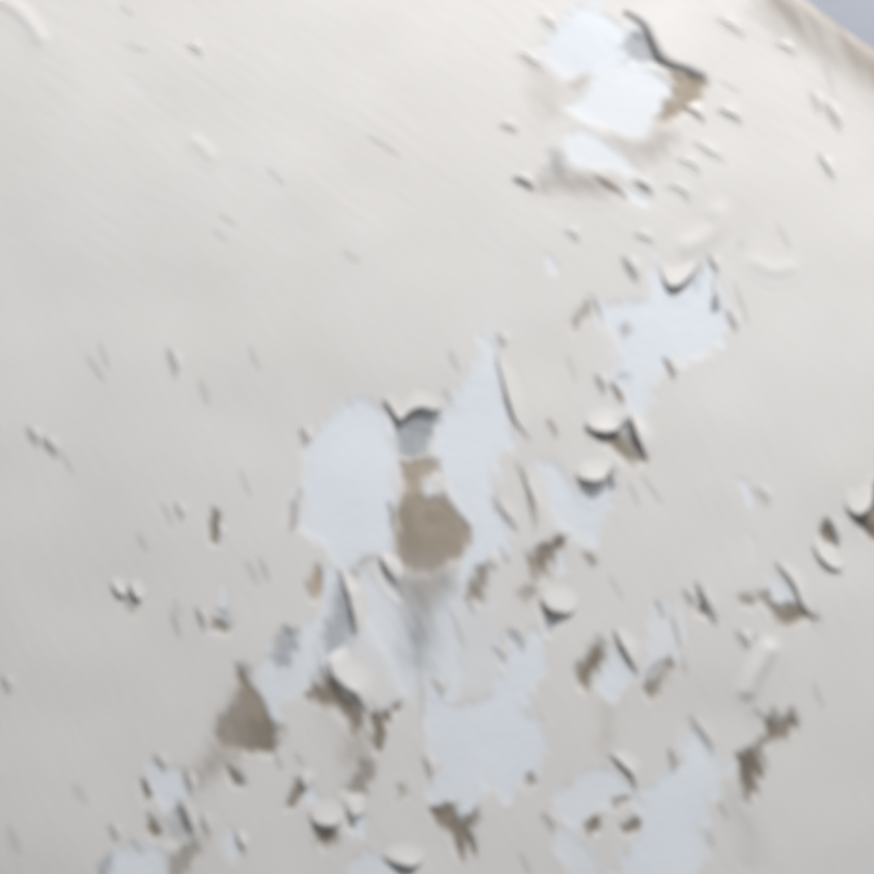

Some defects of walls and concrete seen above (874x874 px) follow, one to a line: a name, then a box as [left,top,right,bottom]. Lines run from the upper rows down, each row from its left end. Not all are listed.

peeling [528,0,728,163]
peeling [511,168,537,192]
peeling [592,174,654,208]
peeling [227,240,807,874]
peeling [734,561,825,636]
peeling [810,470,874,575]
peeling [90,752,251,874]